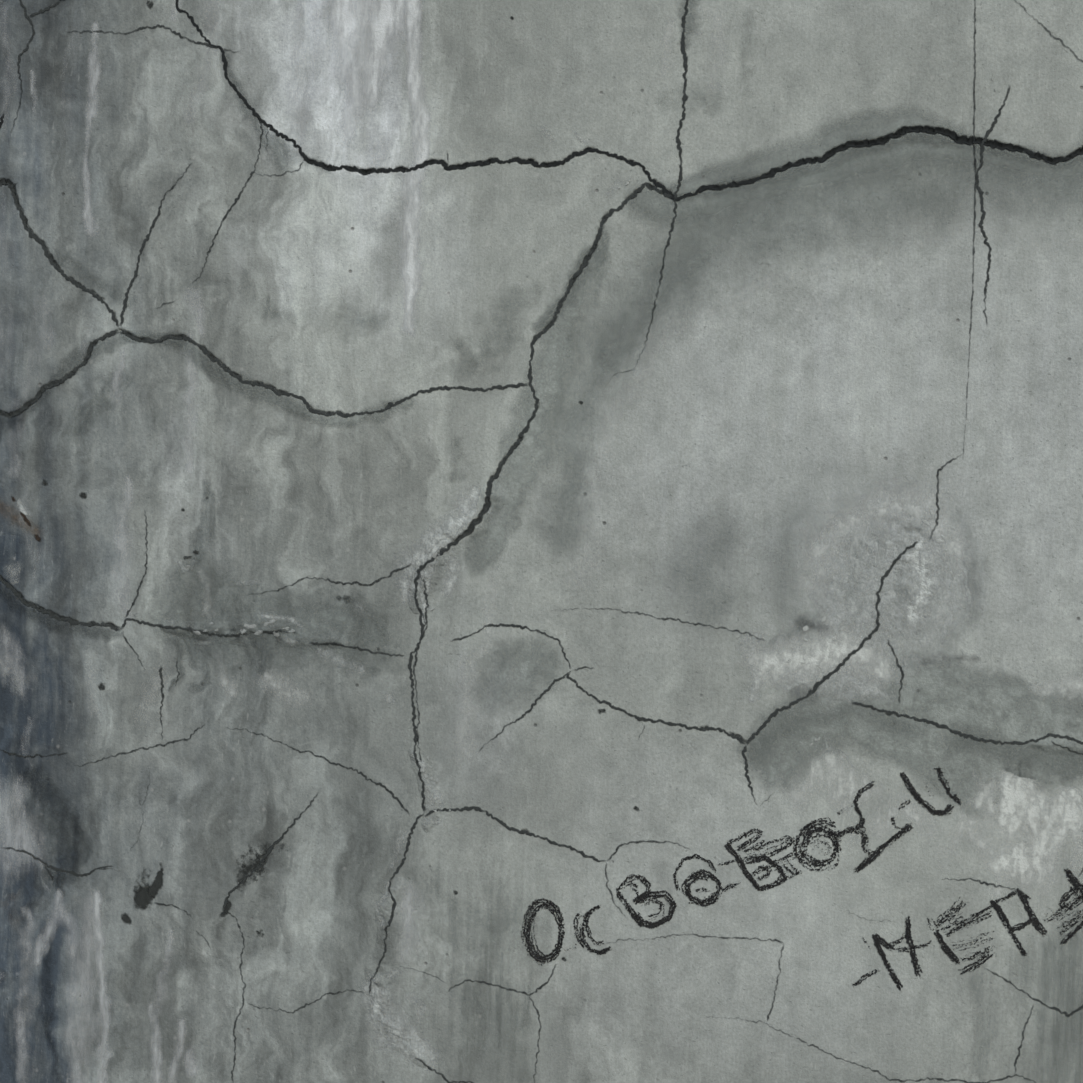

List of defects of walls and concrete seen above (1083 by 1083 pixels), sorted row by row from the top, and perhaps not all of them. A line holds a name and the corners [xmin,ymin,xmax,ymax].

damp [330,0,430,333]
crack [0,0,1083,812]
damp [466,111,1083,571]
peeling [240,615,296,644]
peeling [398,486,491,635]
damp [16,769,84,966]
damp [88,892,110,1083]
crack [223,795,317,1080]
crack [369,806,603,992]
crack [455,969,554,1078]
crack [695,934,1083,1083]
damp [749,656,1083,897]